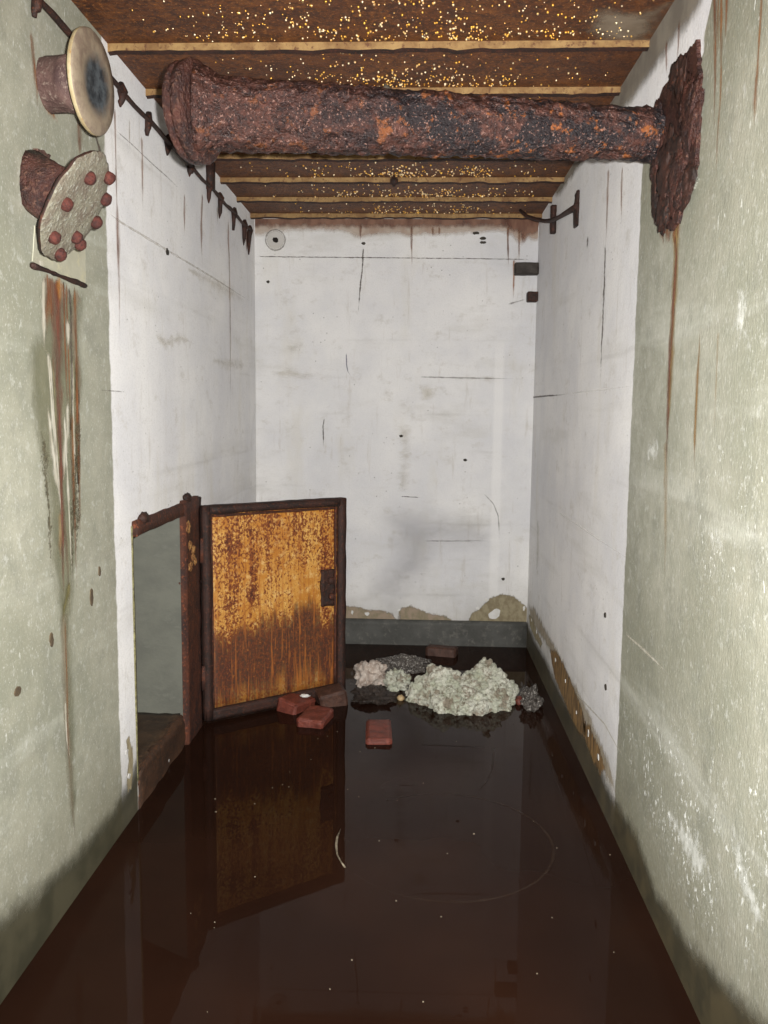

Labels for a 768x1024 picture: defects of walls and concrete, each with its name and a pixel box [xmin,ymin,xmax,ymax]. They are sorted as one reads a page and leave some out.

corrosion [662,224,679,471]
corrosion [34,275,81,752]
peeling [346,606,451,620]
peeling [469,594,605,776]